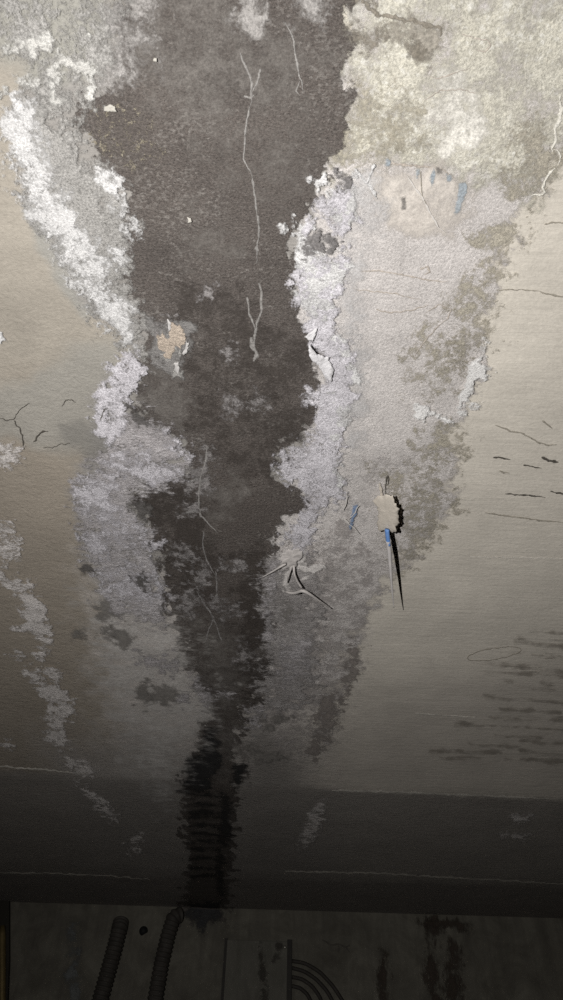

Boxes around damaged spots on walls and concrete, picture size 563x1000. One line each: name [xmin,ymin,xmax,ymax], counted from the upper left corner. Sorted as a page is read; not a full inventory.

crack [285,23,303,95]
crack [240,53,263,361]
crack [0,403,70,448]
spalling [145,313,198,380]
leakage [0,0,444,933]
peeling [257,0,563,769]
leakage [413,337,496,425]
crack [485,420,563,523]